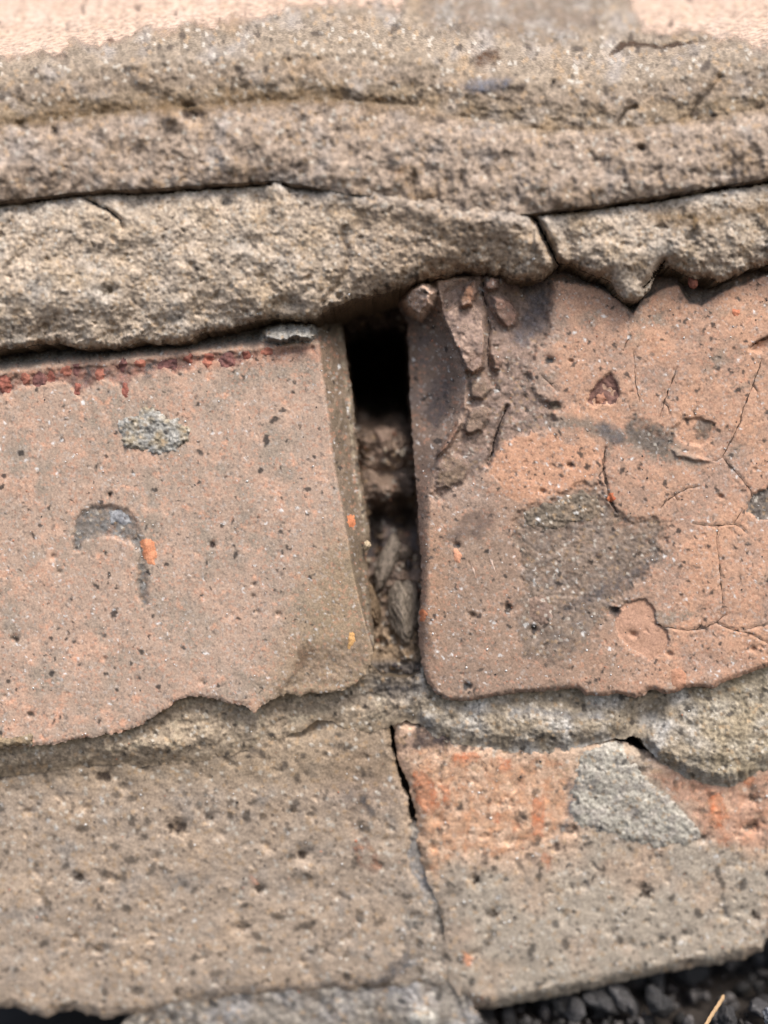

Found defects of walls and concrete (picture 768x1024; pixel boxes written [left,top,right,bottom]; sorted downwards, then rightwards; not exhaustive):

crack [0,181,309,225]
crack [530,179,768,265]
crack [623,339,677,416]
crack [599,450,617,512]
crack [657,338,767,643]
crack [390,725,416,820]